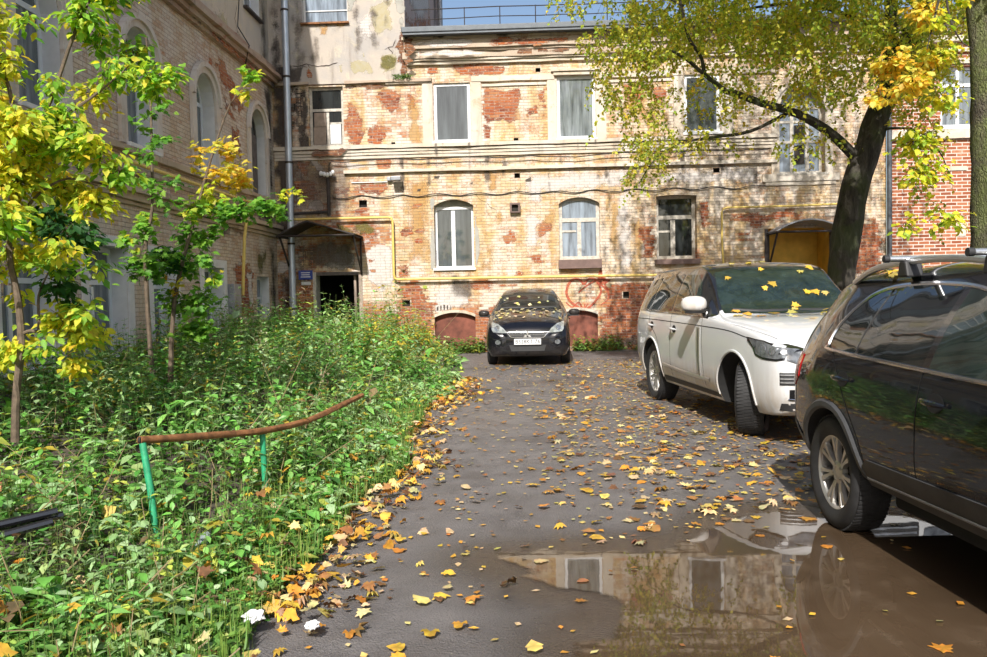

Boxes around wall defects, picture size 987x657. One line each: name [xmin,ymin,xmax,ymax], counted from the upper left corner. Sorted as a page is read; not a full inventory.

water stain [354,9,376,47]
peeling [369,0,505,76]
spalling [209,32,255,158]
peeling [345,56,415,113]
peeling [482,87,547,139]
peeling [294,103,388,200]
peeling [376,158,392,169]
peeling [637,226,655,258]
peeling [730,208,804,241]
peeling [856,218,886,274]
spalling [365,233,437,340]
spalling [599,278,654,349]